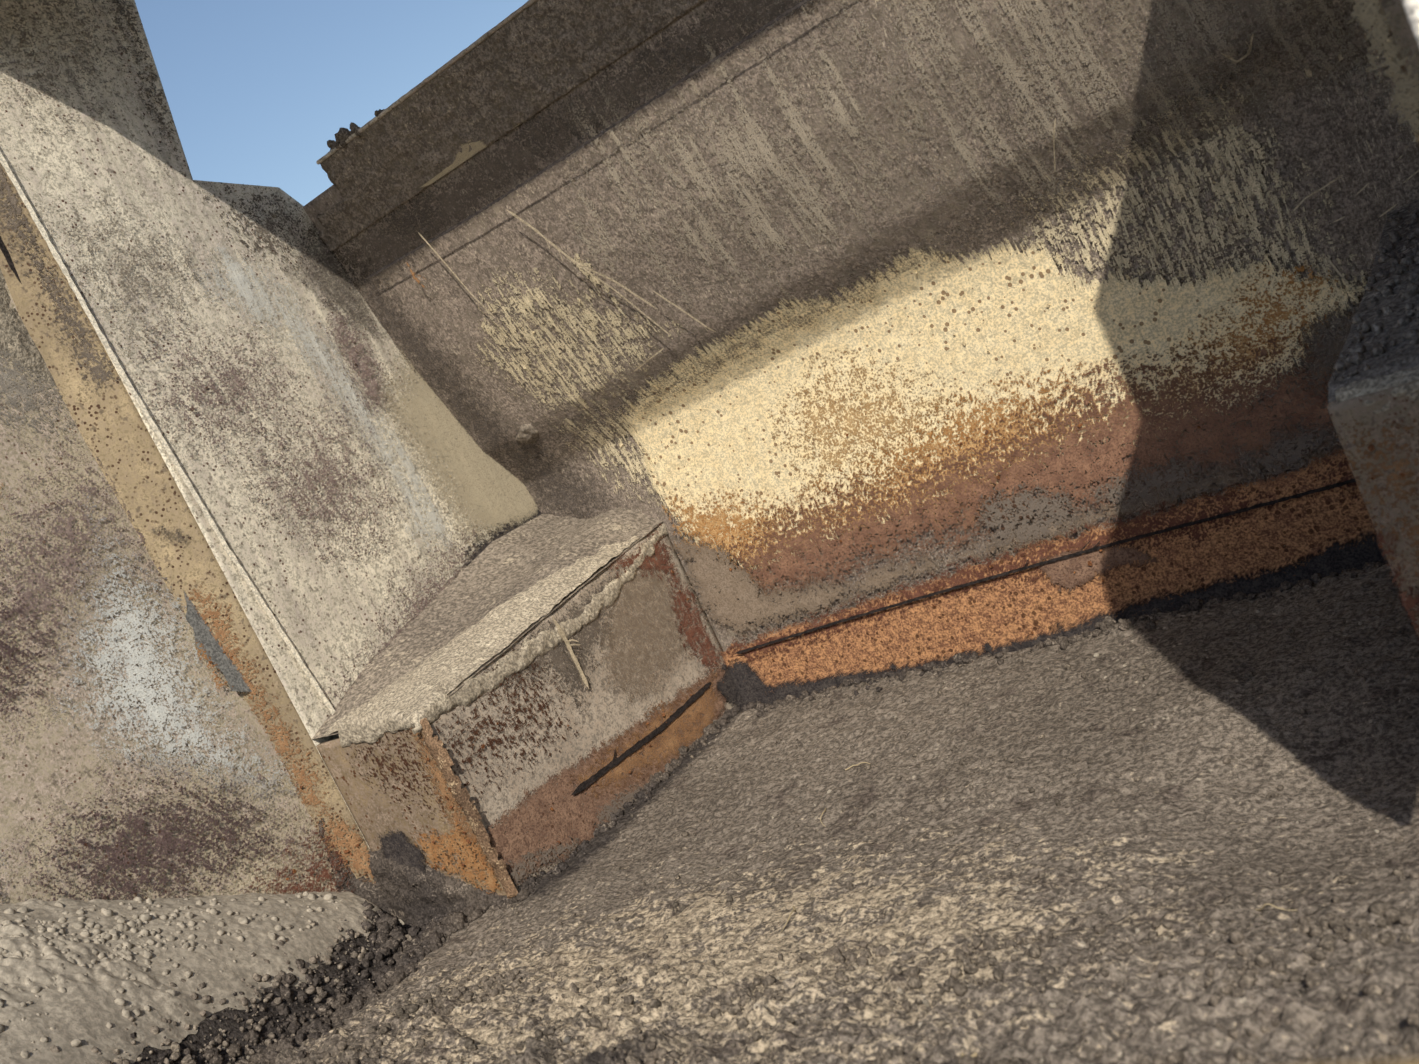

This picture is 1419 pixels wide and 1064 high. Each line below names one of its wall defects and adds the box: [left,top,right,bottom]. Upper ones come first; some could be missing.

corrosion [0,434,376,902]
crack [571,682,711,795]
corrosion [346,263,1419,895]
crack [735,479,1356,654]